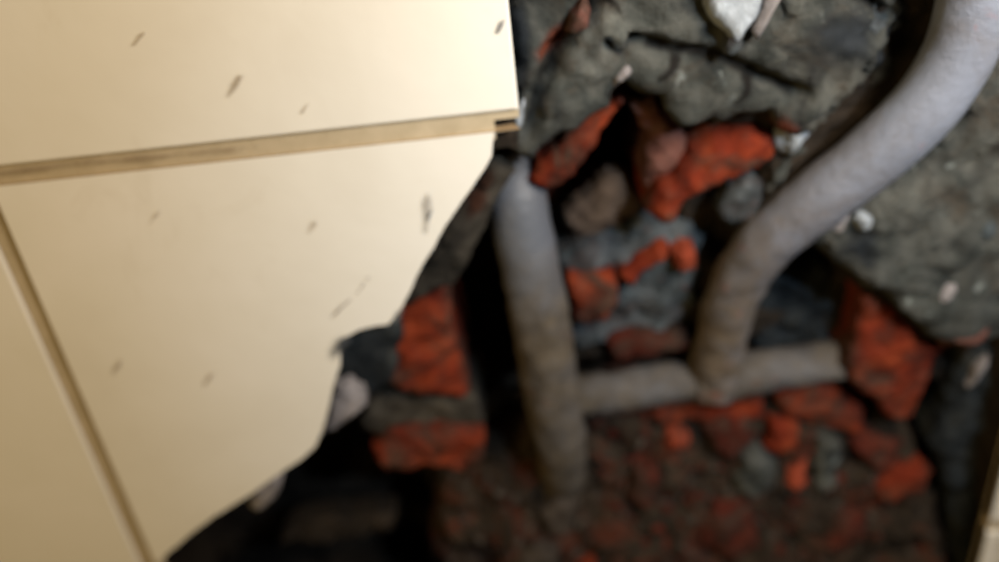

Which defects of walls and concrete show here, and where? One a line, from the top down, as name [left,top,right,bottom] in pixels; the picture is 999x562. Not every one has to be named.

spalling [508,0,907,223]
spalling [0,124,520,562]
spalling [564,237,697,324]
spalling [606,322,690,360]
spalling [646,58,999,562]